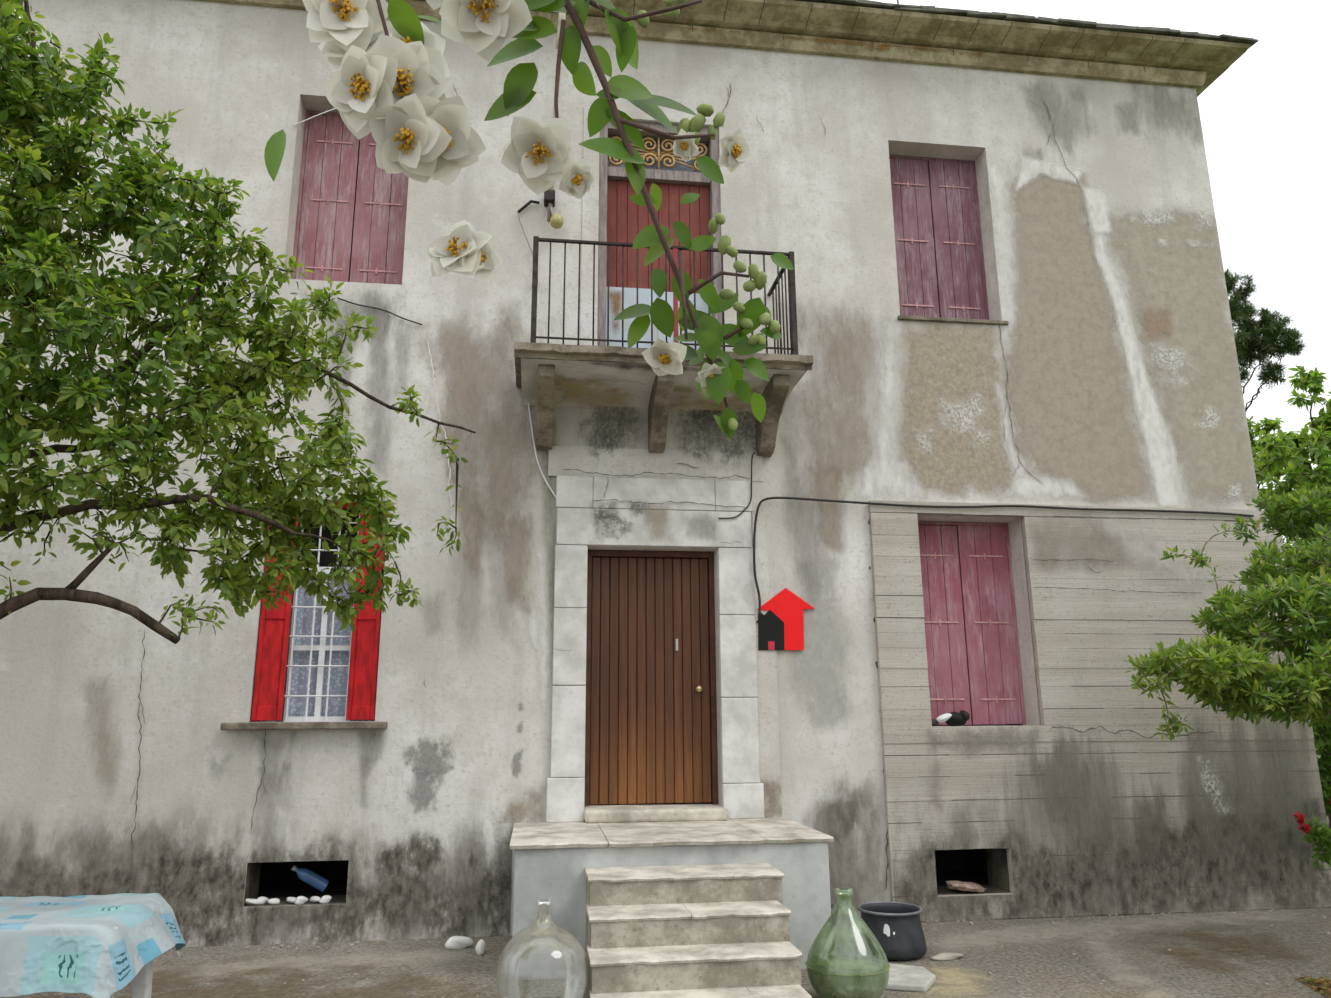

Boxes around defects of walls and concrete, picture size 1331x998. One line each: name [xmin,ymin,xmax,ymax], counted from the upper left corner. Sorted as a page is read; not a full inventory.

leakage [555,380,639,447]
leakage [680,390,757,459]
peeling [900,174,1149,501]
leakage [987,152,1179,506]
peeling [1109,209,1259,502]
crack [131,630,146,870]
leakage [0,828,512,947]
crack [251,730,270,829]
leakage [405,741,452,810]
leakage [813,794,876,913]
leakage [901,740,1330,922]